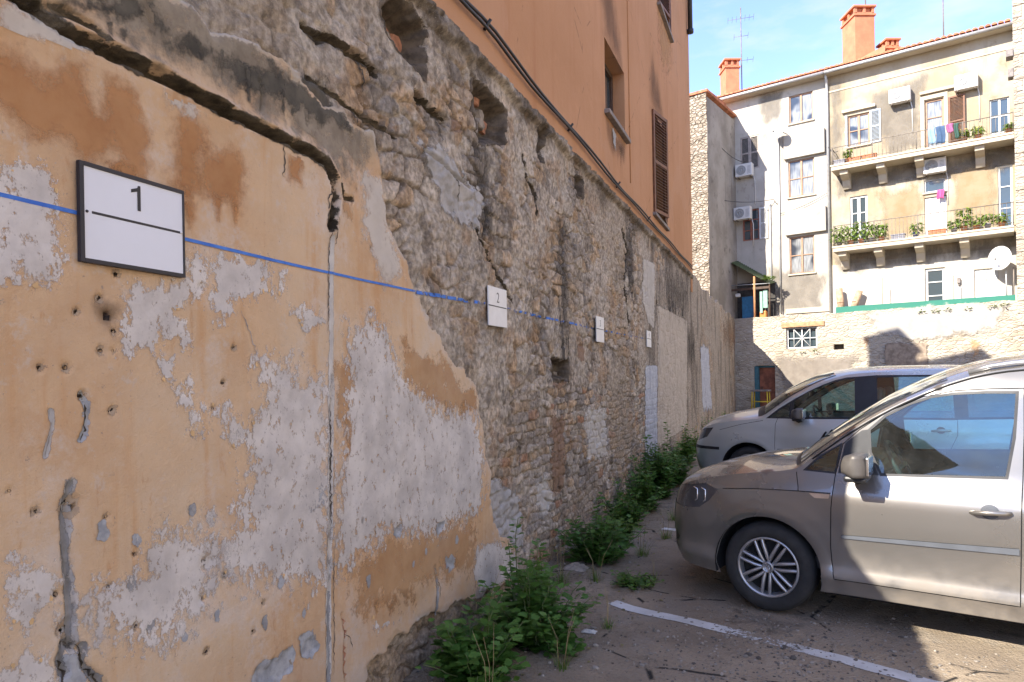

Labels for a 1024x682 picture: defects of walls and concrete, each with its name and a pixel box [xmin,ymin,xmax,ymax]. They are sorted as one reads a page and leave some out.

peeling [0,156,70,291]
leakage [166,93,243,222]
crack [299,24,397,139]
spalling [450,78,508,147]
crack [7,0,353,682]
peeling [0,246,489,682]